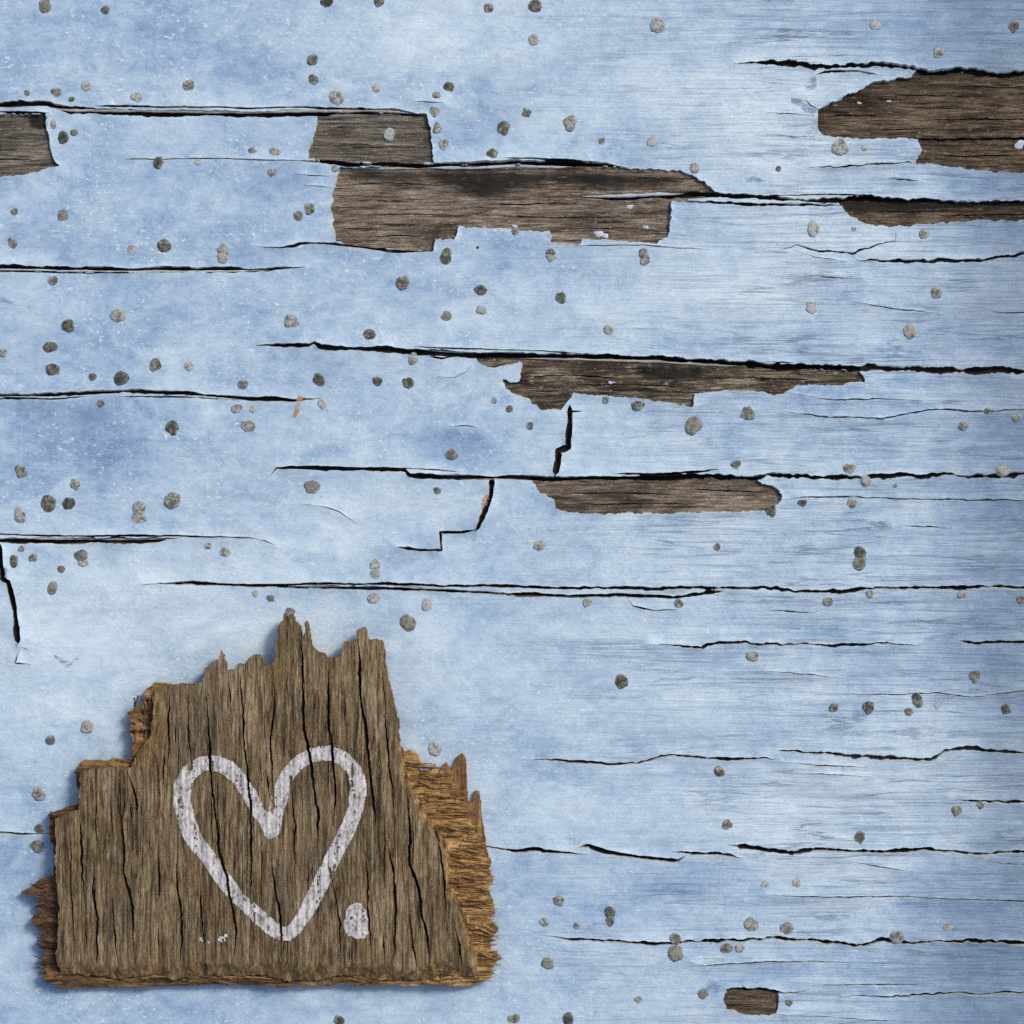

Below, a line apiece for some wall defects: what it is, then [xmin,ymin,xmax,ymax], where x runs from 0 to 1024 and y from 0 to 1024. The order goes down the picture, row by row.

peeling [0,114,59,177]
crack [0,100,439,118]
peeling [818,72,1024,173]
peeling [309,113,714,252]
crack [256,342,1024,378]
peeling [477,357,864,410]
crack [270,406,1024,551]
peeling [532,478,781,515]
crack [0,534,212,664]
crack [168,581,1024,613]
crack [490,843,1024,902]
peeling [723,987,778,1015]